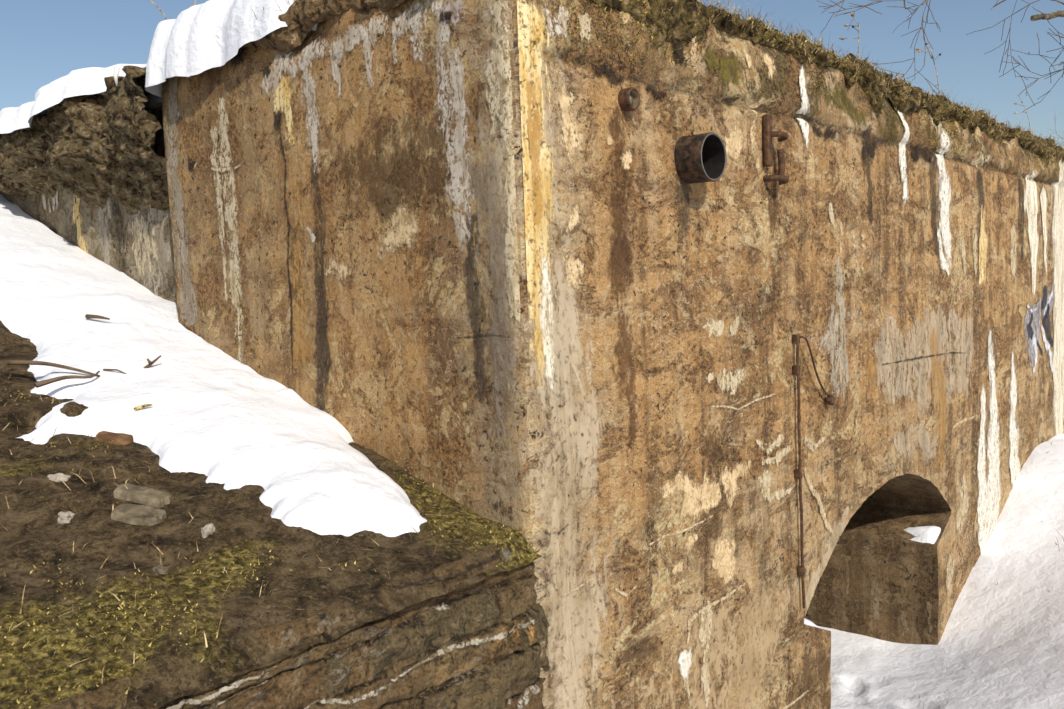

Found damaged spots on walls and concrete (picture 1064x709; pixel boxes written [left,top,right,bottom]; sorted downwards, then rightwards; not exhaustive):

damp [210,98,244,364]
damp [261,0,521,438]
damp [543,5,592,42]
damp [794,66,810,146]
damp [809,88,910,398]
damp [1010,160,1064,436]
damp [529,243,607,709]
damp [304,619,535,709]
damp [615,639,657,668]